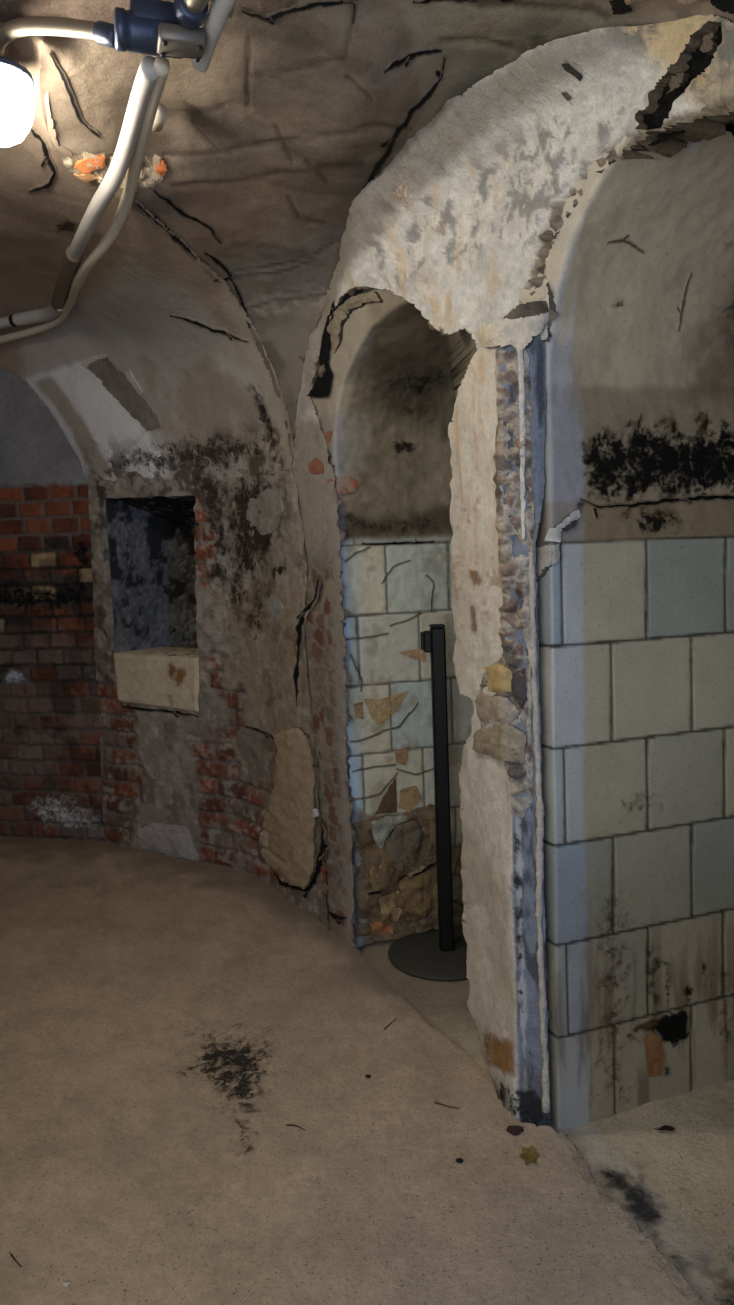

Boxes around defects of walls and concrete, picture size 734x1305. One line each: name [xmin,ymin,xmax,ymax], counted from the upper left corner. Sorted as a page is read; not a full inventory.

crack [241,0,358,26]
peeling [609,0,642,15]
peeling [678,0,734,14]
crack [363,45,446,189]
flaking render [561,61,583,81]
crack [642,15,722,146]
crack [136,188,251,343]
crack [307,290,383,397]
water stain [255,396,270,423]
water stain [111,434,286,640]
crack [293,539,436,706]
efflorescence [31,794,99,831]